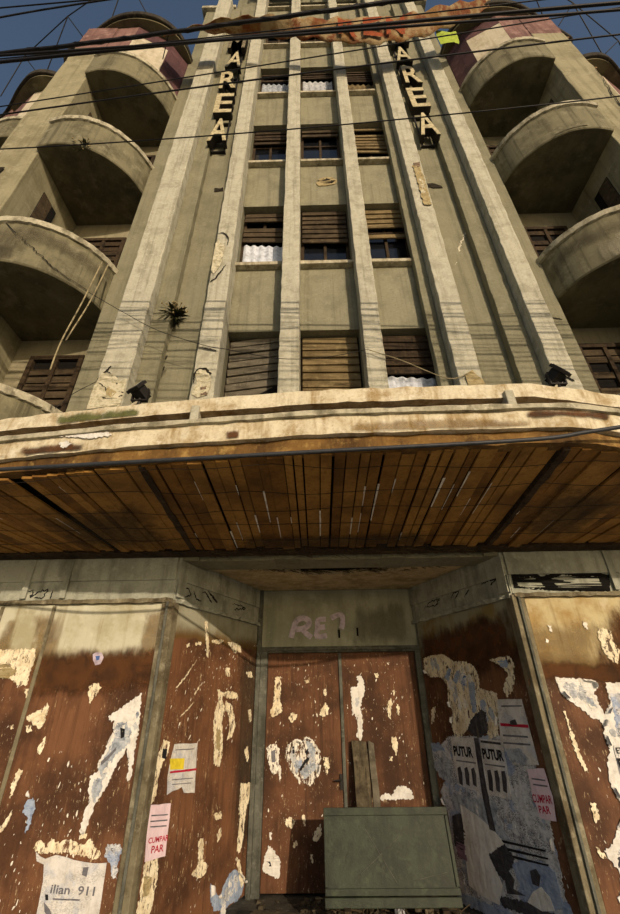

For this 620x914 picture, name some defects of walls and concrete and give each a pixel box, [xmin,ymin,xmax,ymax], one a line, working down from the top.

flaking render [211,239,225,274]
flaking render [87,373,127,409]
flaking render [192,368,211,398]
rust [528,410,609,419]
rust [21,444,82,454]
peeling [0,648,36,698]